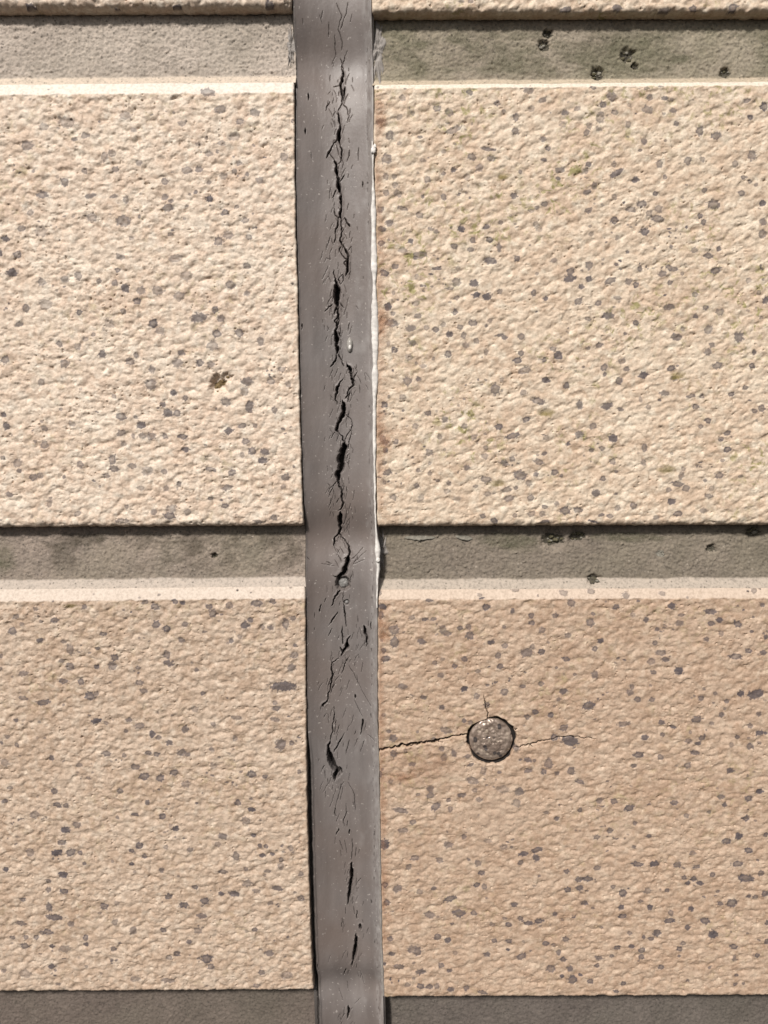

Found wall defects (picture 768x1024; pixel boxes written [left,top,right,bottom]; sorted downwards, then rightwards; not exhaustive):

crack [307,3,489,1024]